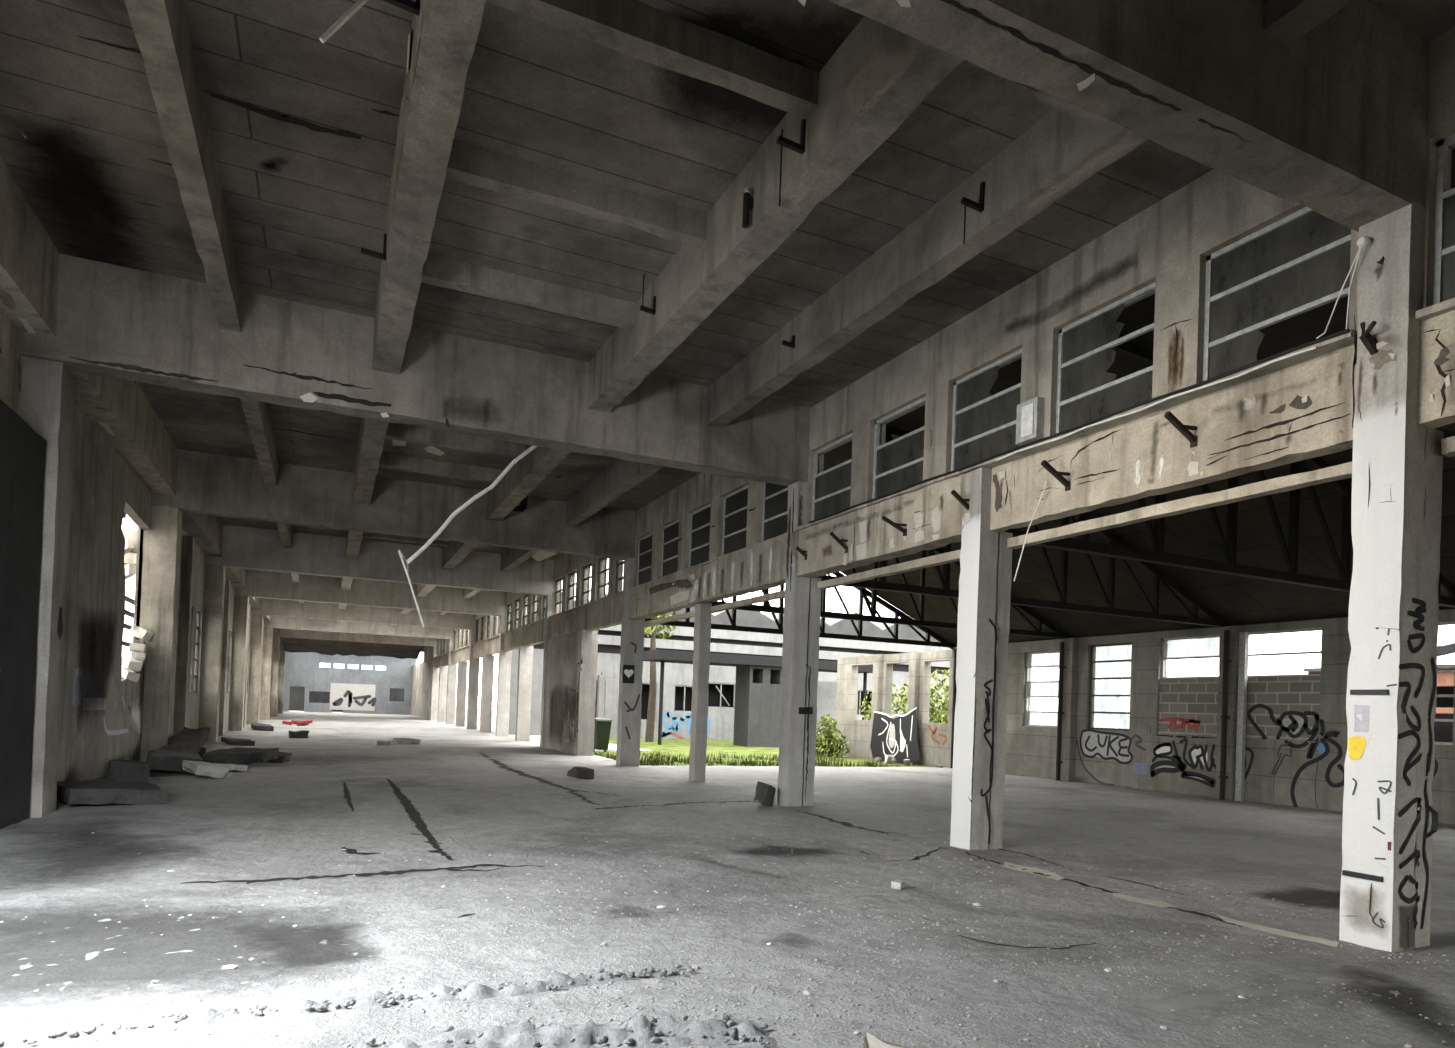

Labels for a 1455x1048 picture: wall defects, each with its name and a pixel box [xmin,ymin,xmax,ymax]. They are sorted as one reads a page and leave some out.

crack [209,7,425,139]
crack [940,0,1251,143]
leakage [26,129,136,268]
crack [1423,329,1455,415]
crack [179,847,543,884]
leakage [0,909,362,998]